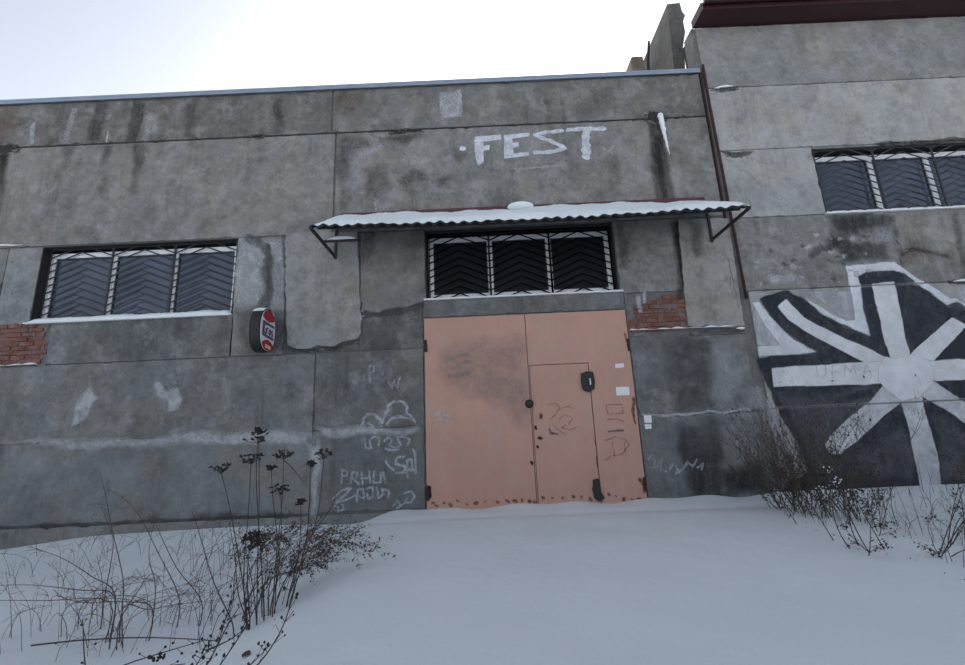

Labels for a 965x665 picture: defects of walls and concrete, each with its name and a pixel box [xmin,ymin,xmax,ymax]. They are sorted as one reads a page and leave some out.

leakage [650,124,666,179]
flaking render [628,295,745,335]
flaking render [0,324,51,367]